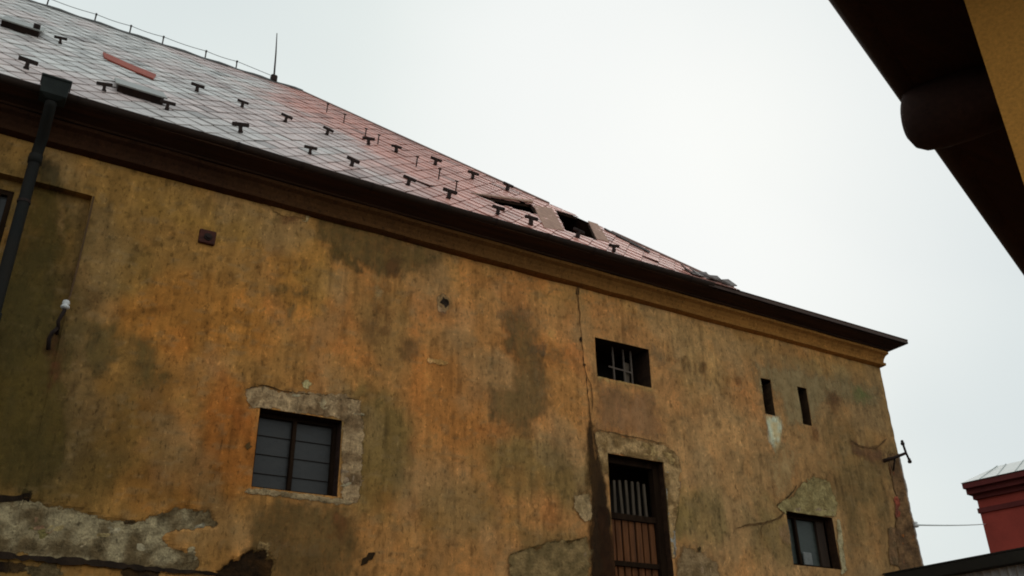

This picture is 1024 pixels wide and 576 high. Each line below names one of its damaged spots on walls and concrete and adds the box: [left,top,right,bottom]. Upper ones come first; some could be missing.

damp [490,309,559,435]
crack [576,287,597,460]
peeling [245,380,365,506]
spalling [0,500,218,572]
spalling [217,541,274,576]
spalling [509,536,591,576]
spalling [574,494,592,522]
peeling [595,429,720,576]
crack [738,512,785,536]
spalling [777,476,847,574]